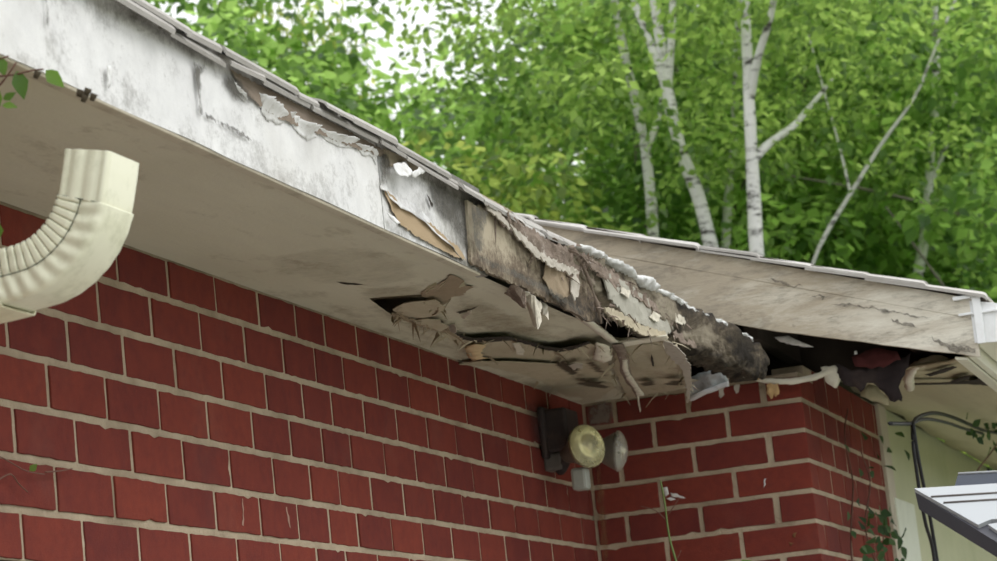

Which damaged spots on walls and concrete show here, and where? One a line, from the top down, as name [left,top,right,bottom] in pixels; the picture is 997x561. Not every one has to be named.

leakage [189,50,204,114]
leakage [227,77,252,101]
peeling [230,69,426,178]
peeling [380,184,466,261]
leakage [432,185,580,311]
peeling [421,275,473,334]
peeling [504,285,549,329]
peeling [570,273,580,301]
crack [766,278,988,386]
peeling [611,343,645,412]